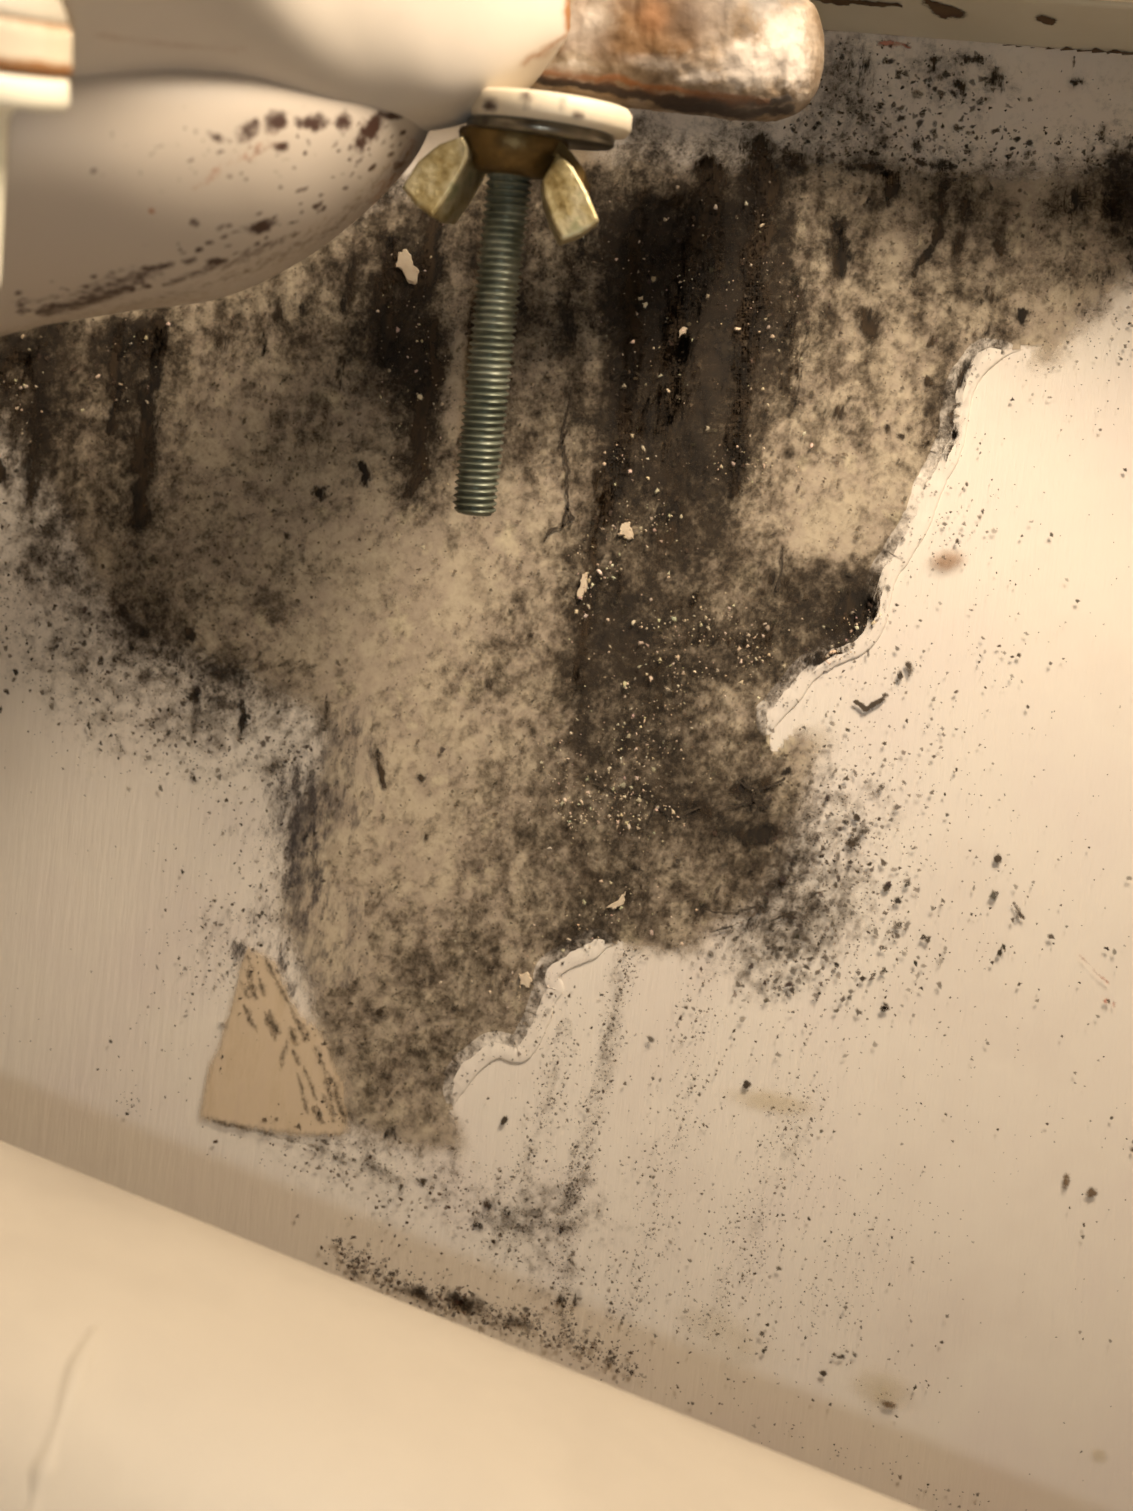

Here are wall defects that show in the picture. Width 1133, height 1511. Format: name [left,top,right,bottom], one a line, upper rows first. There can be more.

damp [301,479,352,524]
peeling [47,149,1133,1147]
damp [931,846,1082,950]
damp [1063,1174,1097,1209]
damp [865,1378,962,1427]